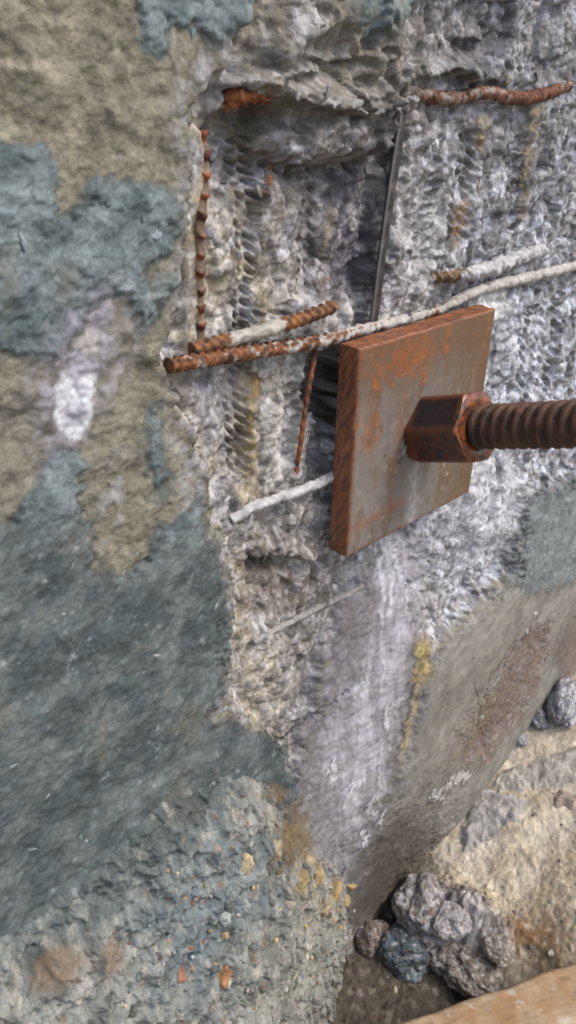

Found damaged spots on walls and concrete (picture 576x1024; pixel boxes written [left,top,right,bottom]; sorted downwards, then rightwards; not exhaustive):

spalling [0,0,576,404]
peeling [0,342,576,937]